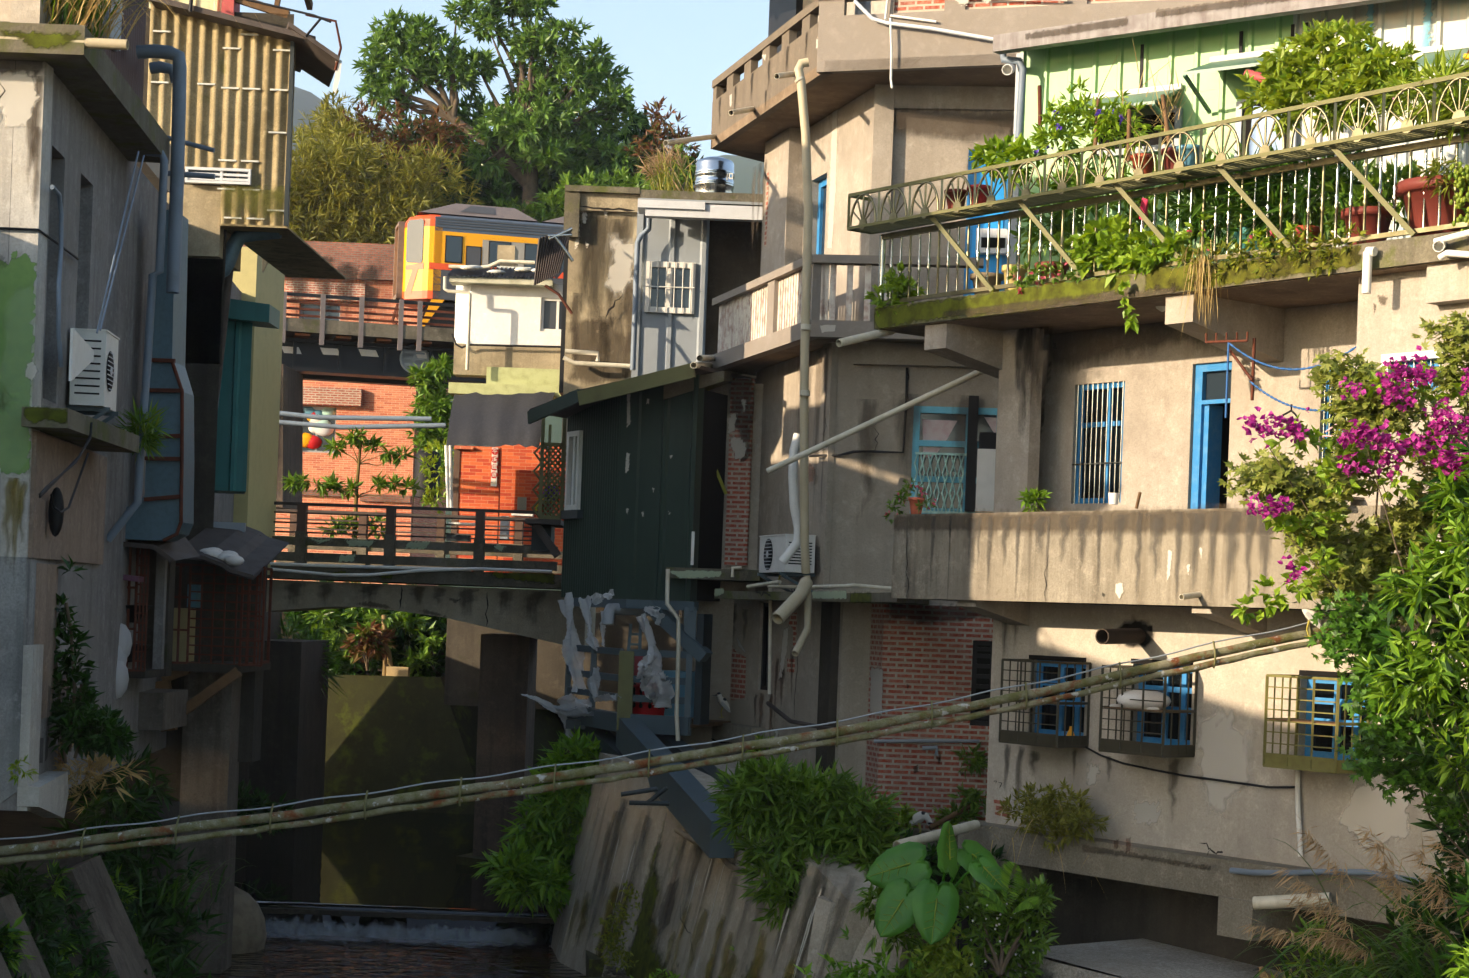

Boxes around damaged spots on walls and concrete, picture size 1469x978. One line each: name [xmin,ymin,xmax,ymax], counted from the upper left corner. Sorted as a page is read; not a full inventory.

damp [0,60,43,194]
damp [943,288,1201,434]
damp [5,479,26,555]
damp [650,859,821,978]